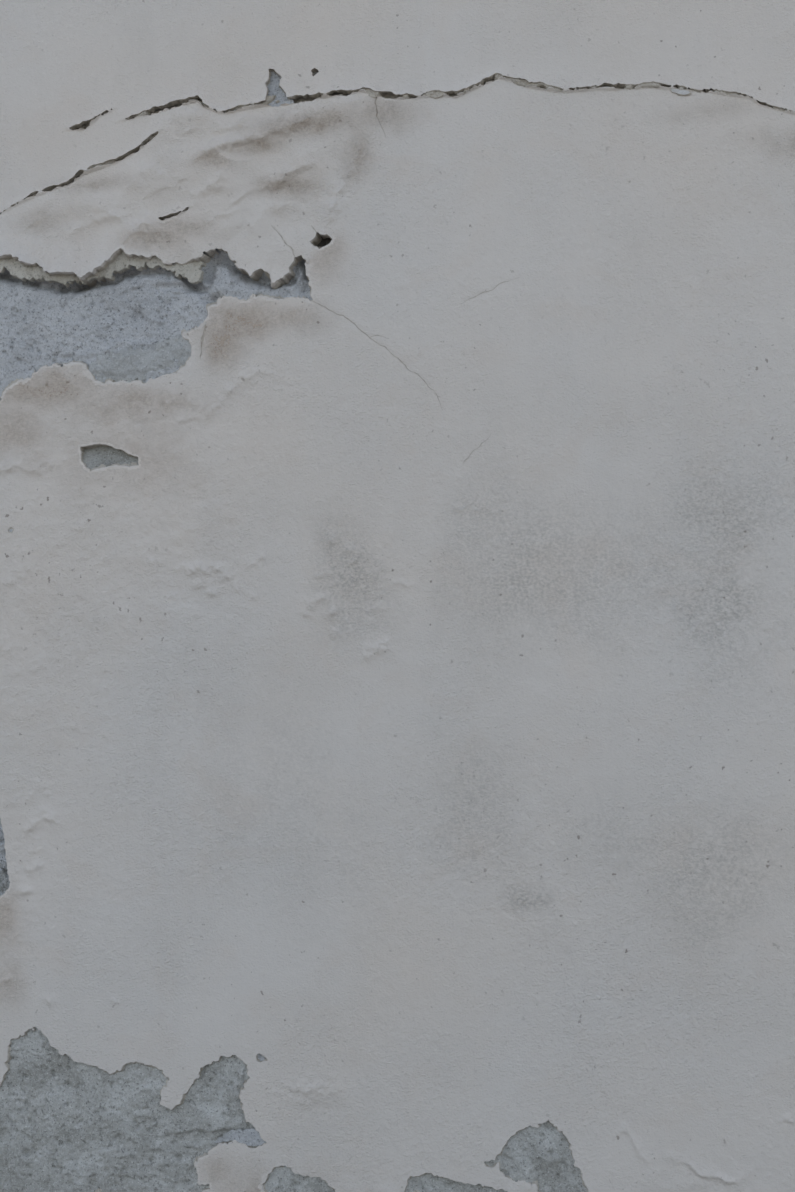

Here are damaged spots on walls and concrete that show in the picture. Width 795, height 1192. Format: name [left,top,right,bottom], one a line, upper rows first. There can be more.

crack [0,73,792,214]
spalling [0,69,374,401]
spalling [80,444,139,472]
spalling [0,1027,268,1192]
spalling [261,1166,335,1192]
spalling [404,1120,589,1192]